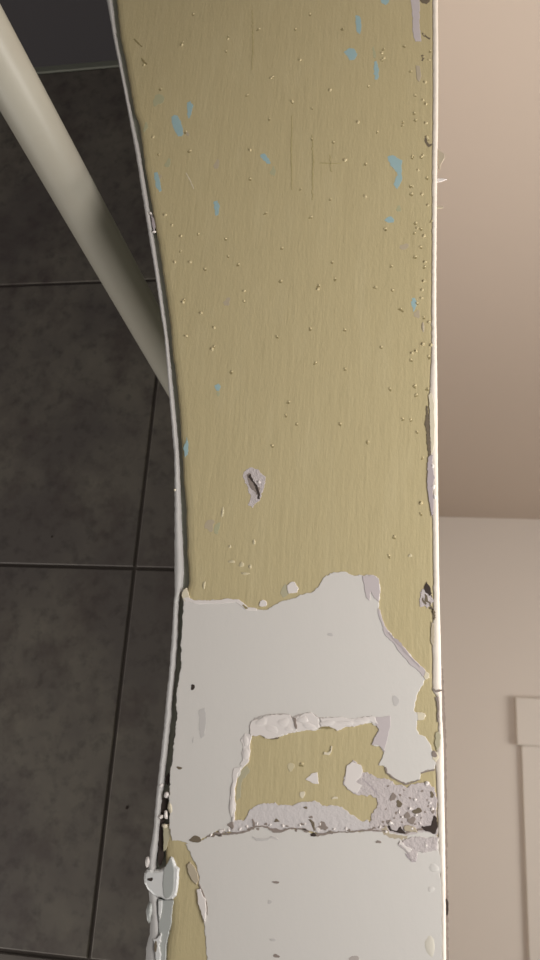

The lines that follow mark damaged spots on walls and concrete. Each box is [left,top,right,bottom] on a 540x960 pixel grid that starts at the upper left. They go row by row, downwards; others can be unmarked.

spalling [243,467,266,508]
peeling [169,571,442,960]